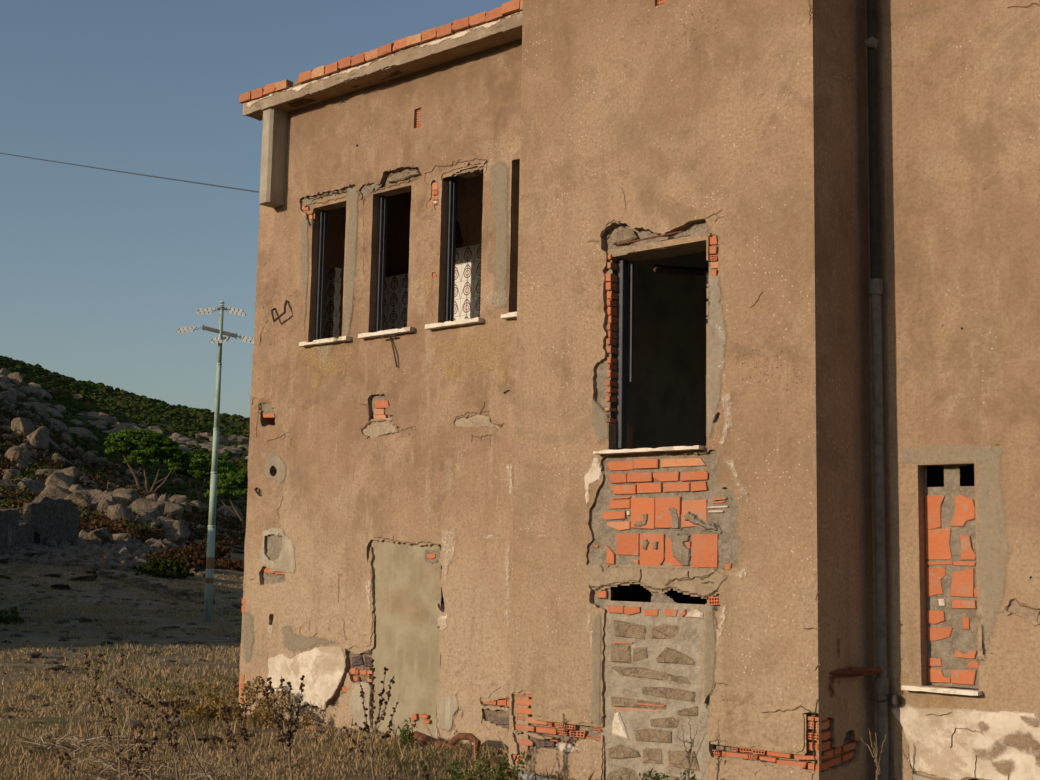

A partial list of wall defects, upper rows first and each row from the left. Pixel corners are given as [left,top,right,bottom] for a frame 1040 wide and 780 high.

crack [1008,0,1040,8]
spalling [301,113,510,322]
flaking render [595,221,721,423]
spalling [362,395,416,439]
spalling [454,412,501,428]
spalling [588,450,739,571]
spalling [263,533,285,584]
crack [1005,598,1040,621]
flaking render [340,648,374,695]
flaking render [477,694,604,780]
flaking render [706,712,856,780]
peeling [972,716,1040,775]